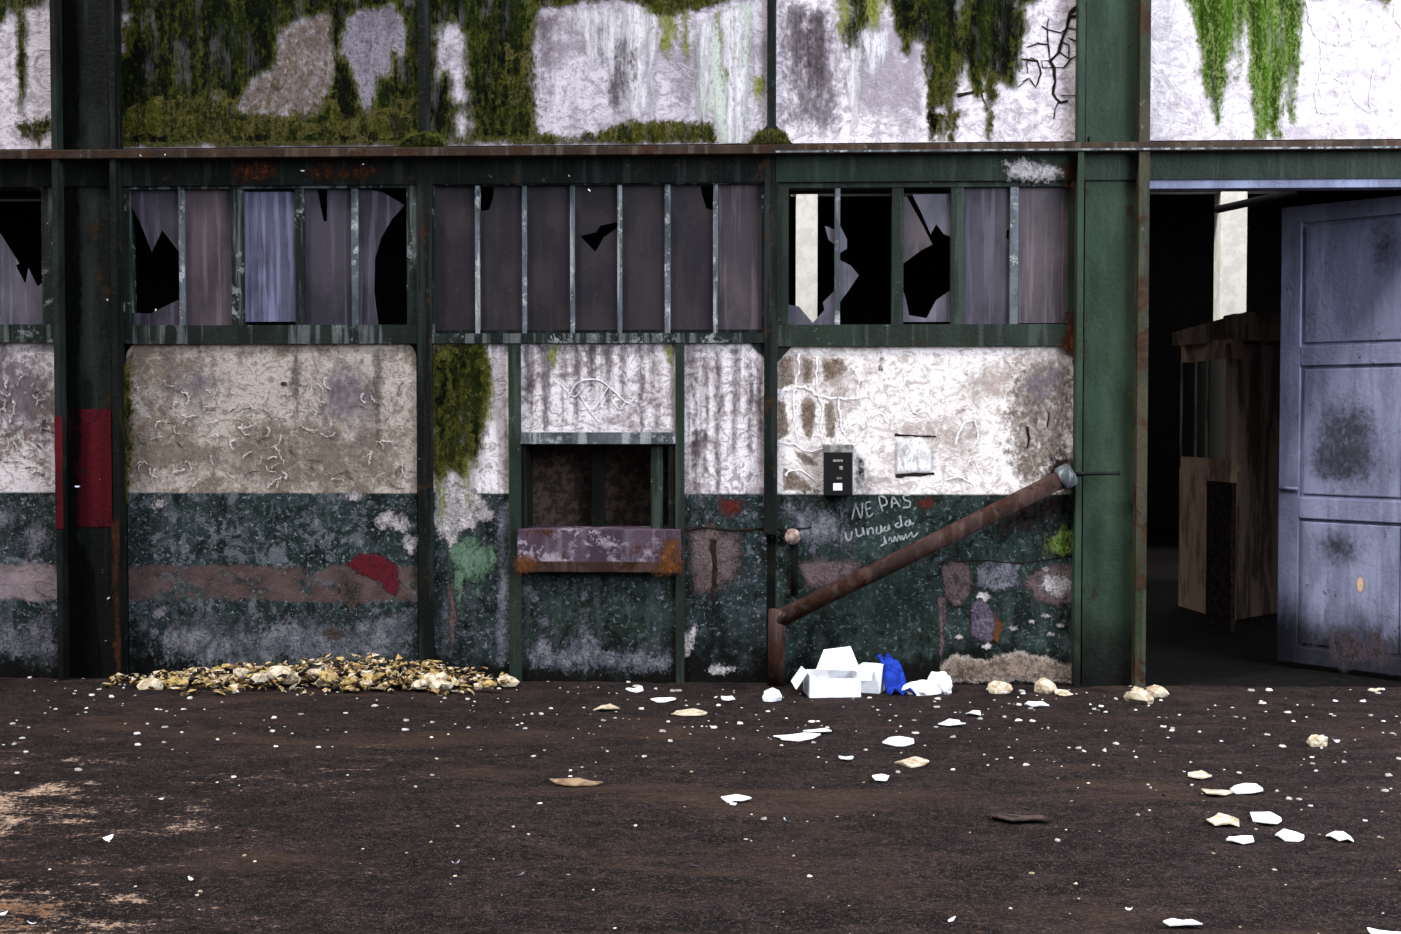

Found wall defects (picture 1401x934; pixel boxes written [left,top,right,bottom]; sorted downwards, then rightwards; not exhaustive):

damp [15,4,29,114]
damp [541,2,765,143]
damp [780,0,988,136]
crack [957,90,985,103]
crack [1018,5,1076,119]
damp [1194,0,1304,139]
peeling [0,373,52,480]
peeling [0,501,54,565]
corrosion [513,554,541,575]
corrosion [651,538,685,576]
peeling [0,593,58,666]
corrosion [936,594,948,666]